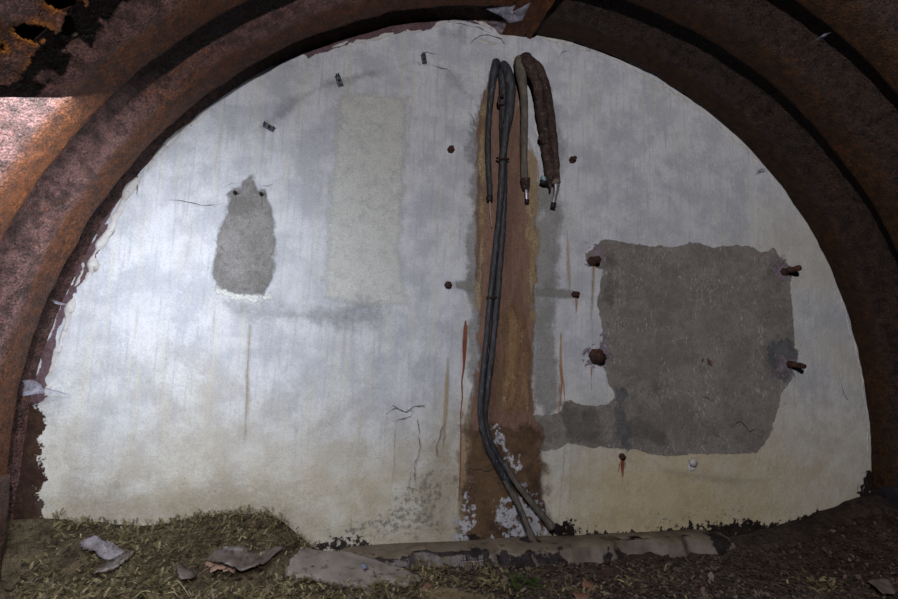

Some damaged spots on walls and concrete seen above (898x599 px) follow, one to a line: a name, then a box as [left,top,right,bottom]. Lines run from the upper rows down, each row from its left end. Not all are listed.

flaking render [212,176,275,295]
rust [451,75,551,541]
flaking render [533,183,798,456]